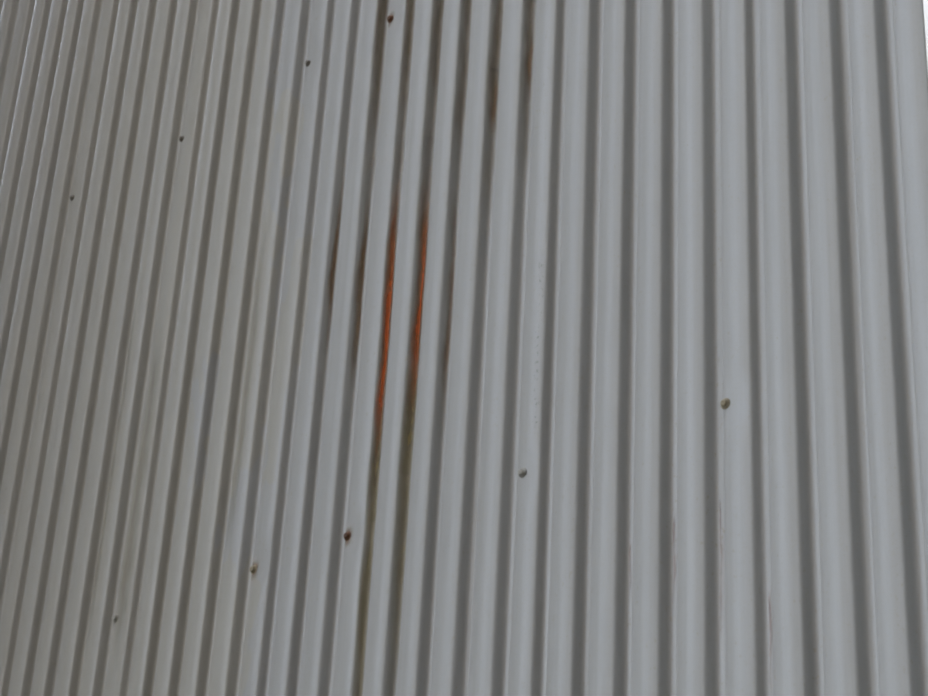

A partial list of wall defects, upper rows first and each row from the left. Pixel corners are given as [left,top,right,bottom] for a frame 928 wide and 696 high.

rust [377,234,395,416]
rust [413,224,426,363]